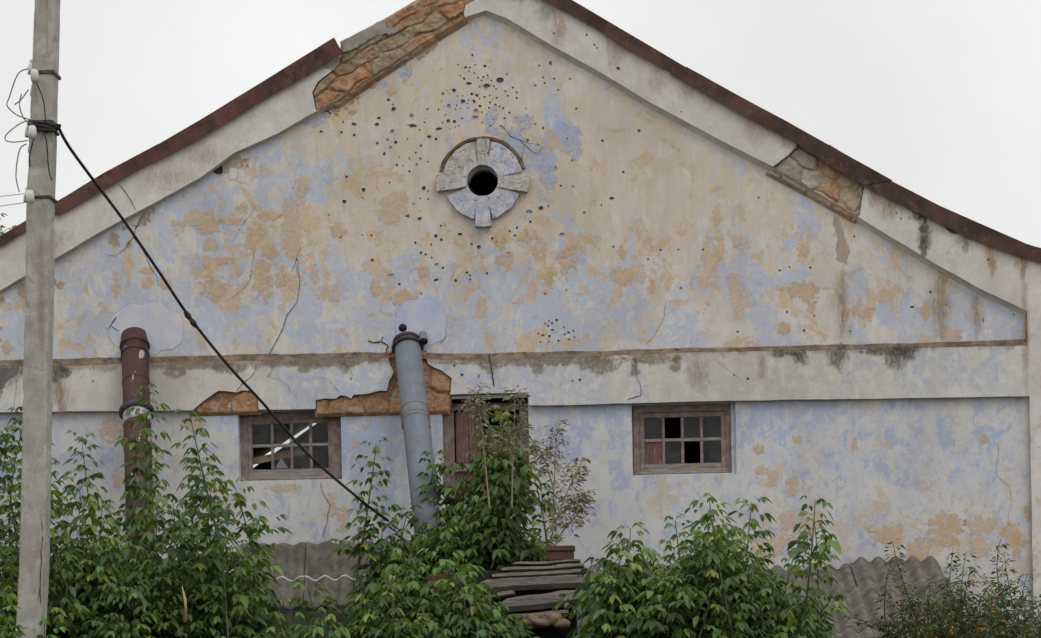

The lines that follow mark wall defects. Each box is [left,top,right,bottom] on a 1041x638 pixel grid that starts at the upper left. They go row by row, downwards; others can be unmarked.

spalling [303,0,583,305]
spalling [766,144,864,265]
damp [914,213,930,256]
crack [236,248,301,391]
spalling [183,391,262,434]
spalling [315,351,401,461]
spalling [421,350,463,415]
damp [774,350,805,363]
damp [860,346,918,369]